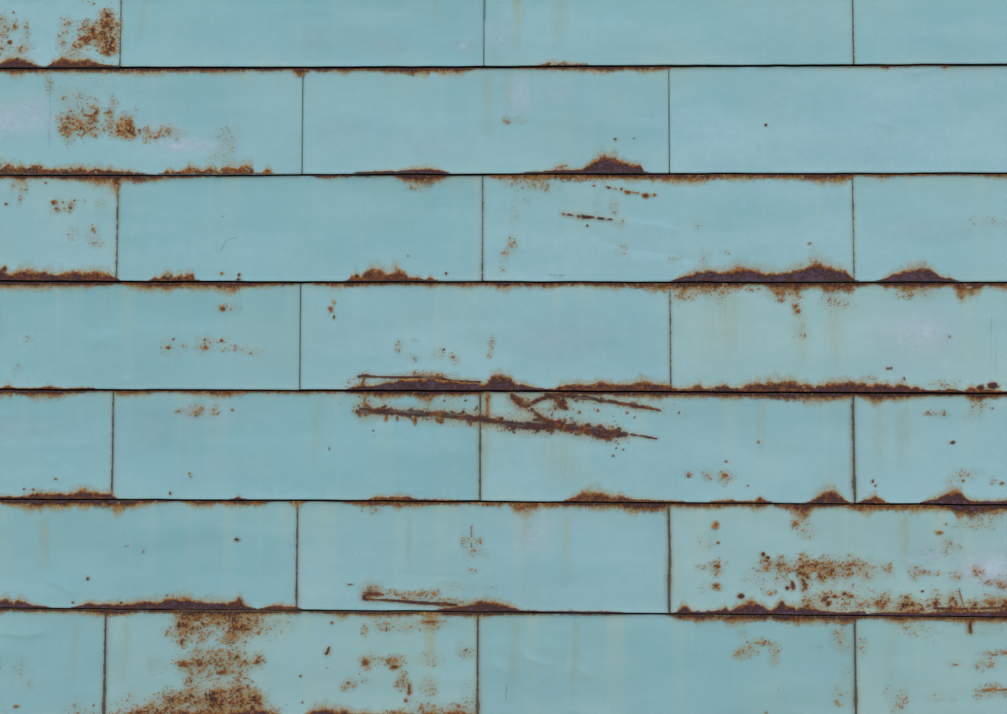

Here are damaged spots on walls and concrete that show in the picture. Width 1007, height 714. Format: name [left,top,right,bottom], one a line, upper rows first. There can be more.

corrosion [0,3,483,91]
corrosion [0,154,272,240]
corrosion [490,155,1007,198]
corrosion [0,251,1007,313]
corrosion [0,357,1007,714]